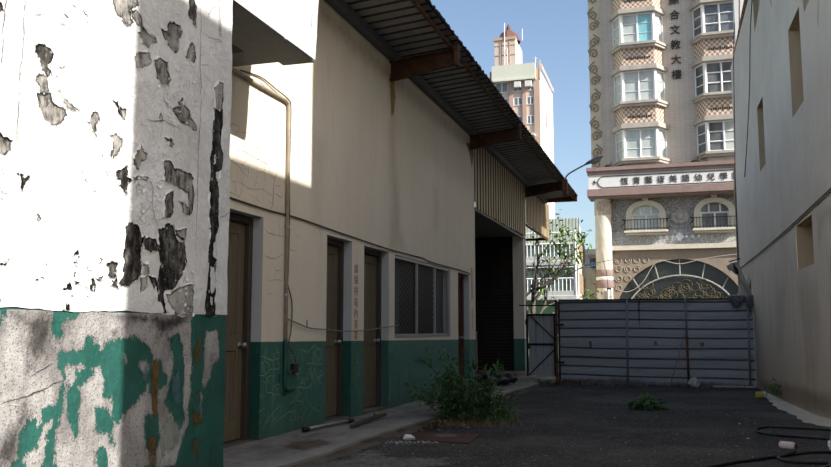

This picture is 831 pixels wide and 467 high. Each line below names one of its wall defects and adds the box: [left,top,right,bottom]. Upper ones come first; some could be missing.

peeling [34,43,100,139]
peeling [113,0,198,131]
crack [222,124,280,217]
peeling [0,79,224,467]
crack [258,344,324,430]